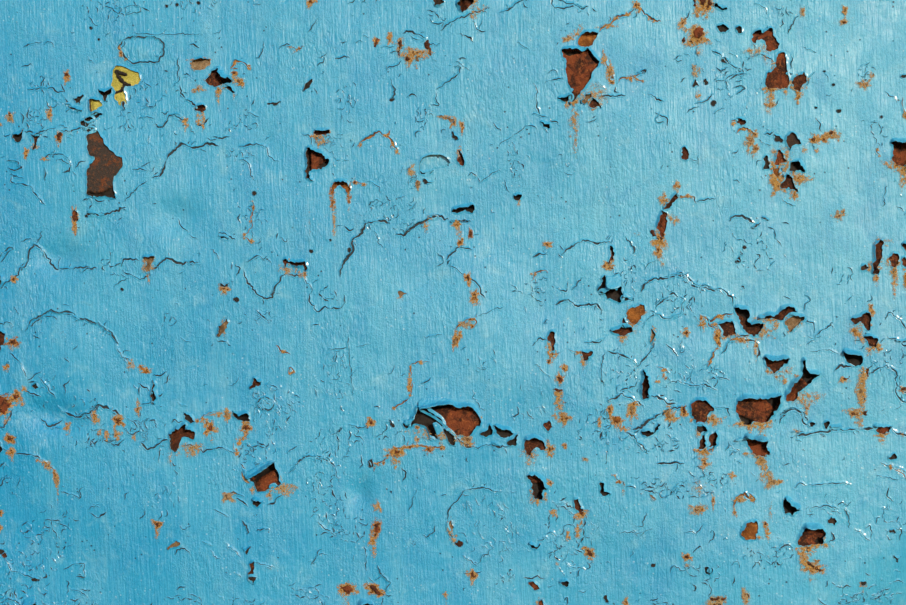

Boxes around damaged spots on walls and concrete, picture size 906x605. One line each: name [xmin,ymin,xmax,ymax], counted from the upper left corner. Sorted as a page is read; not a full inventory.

peeling [65,64,143,200]
crack [0,0,279,224]
rust [372,32,433,69]
crack [314,0,529,138]
peeling [557,29,606,111]
crack [577,0,906,271]
rust [802,129,842,153]
rust [650,230,668,265]
rust [0,385,27,461]
peeling [389,397,554,506]
peeling [688,354,843,458]
crack [774,266,906,451]